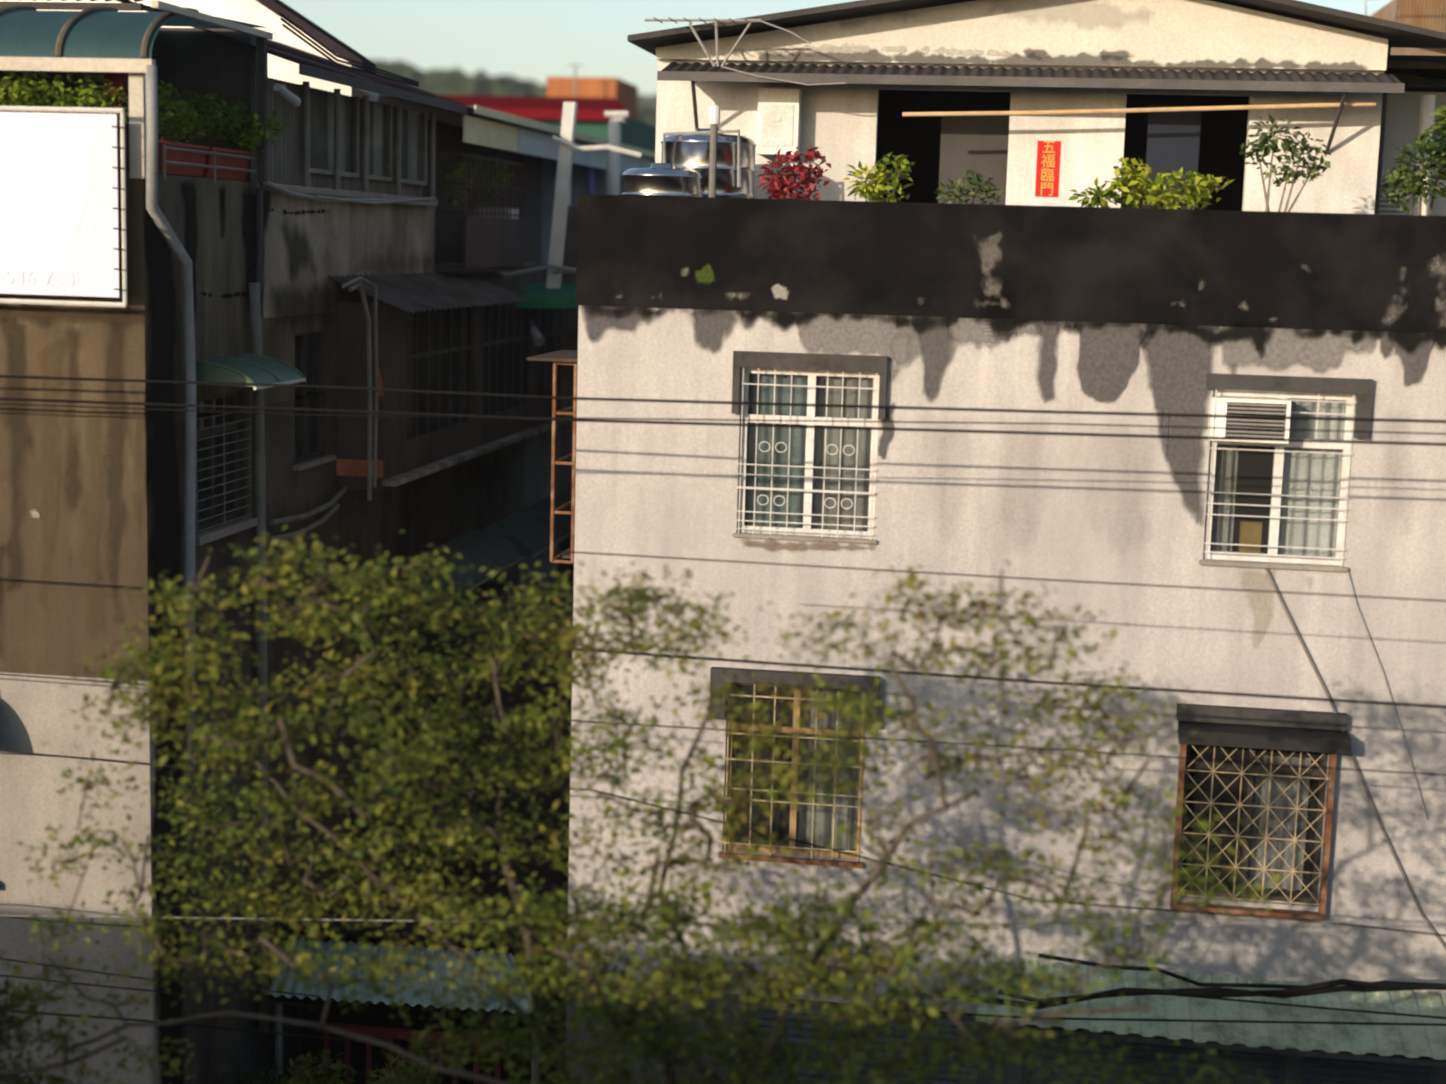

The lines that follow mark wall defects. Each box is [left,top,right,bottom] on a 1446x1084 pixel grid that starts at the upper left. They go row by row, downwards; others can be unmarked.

leakage [243,187,341,326]
peeling [980,235,1008,307]
peeling [1383,296,1403,323]
peeling [1431,258,1446,325]
leakage [694,309,1446,522]